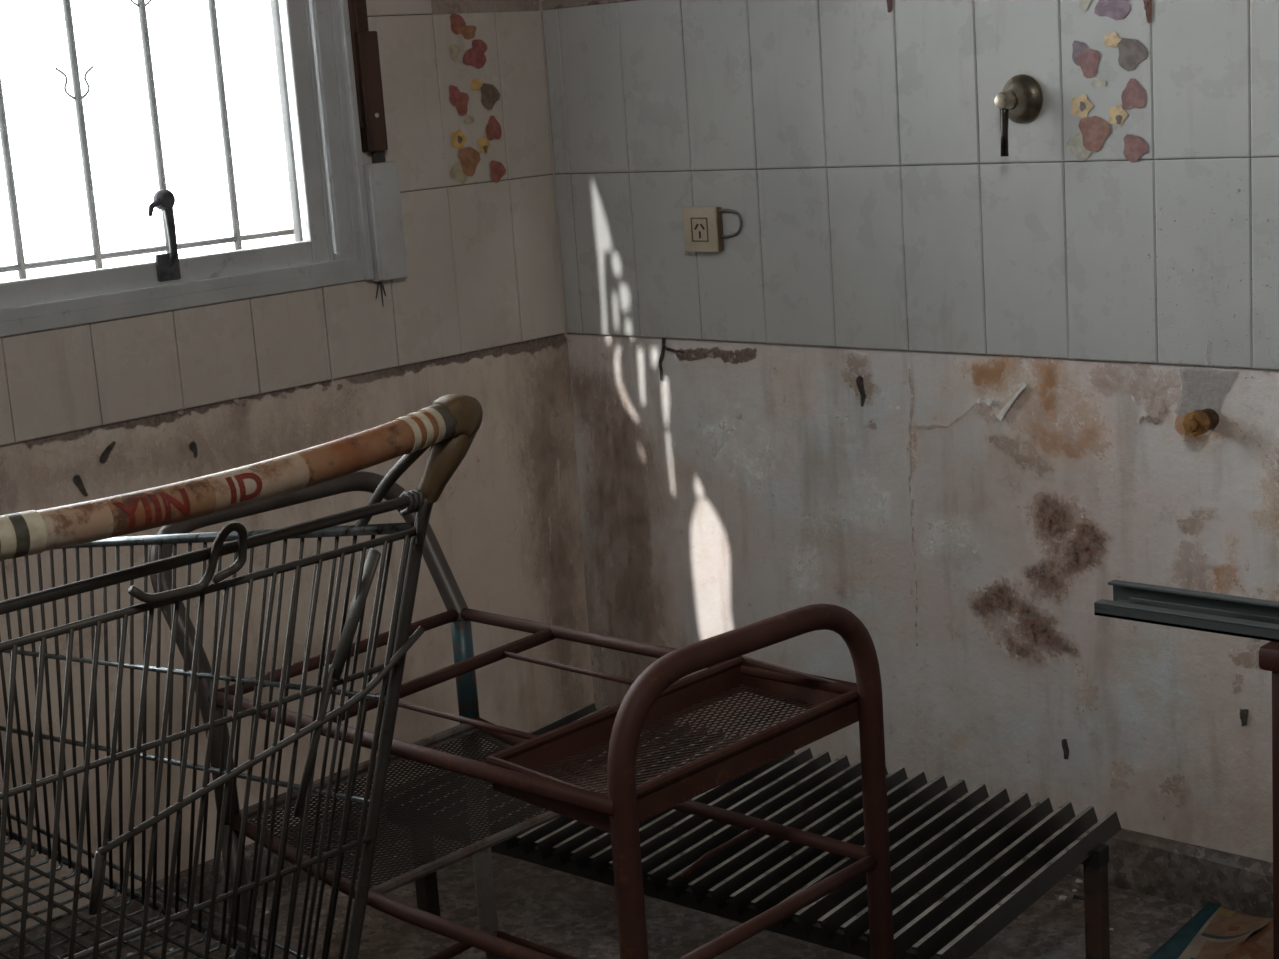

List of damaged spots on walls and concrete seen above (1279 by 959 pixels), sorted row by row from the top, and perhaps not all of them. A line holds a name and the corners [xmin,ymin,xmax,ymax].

peeling [675,347,756,364]
flaking render [844,357,872,407]
peeling [977,383,1026,423]
crack [909,369,977,565]
leakage [523,341,663,713]
leakage [1024,495,1106,594]
leakage [968,585,1077,662]